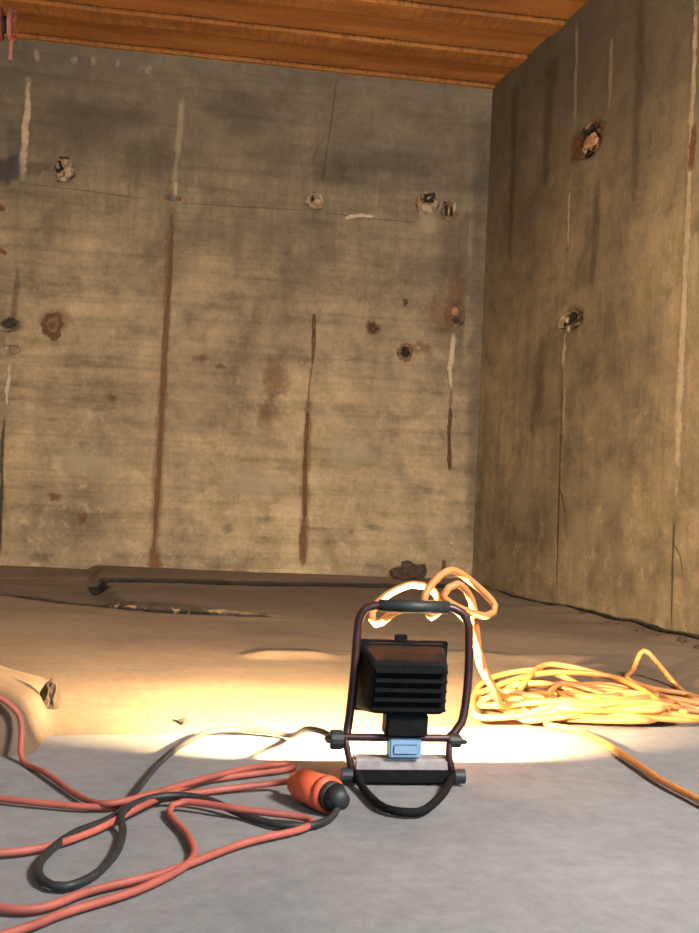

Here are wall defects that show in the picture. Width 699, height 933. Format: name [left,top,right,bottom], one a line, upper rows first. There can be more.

leakage [0,81,31,184]
spalling [572,118,606,162]
spalling [53,156,75,182]
spalling [416,191,457,222]
leakage [675,4,698,496]
rust [41,312,63,340]
spalling [557,308,583,332]
rust [150,232,173,568]
rust [299,414,309,564]